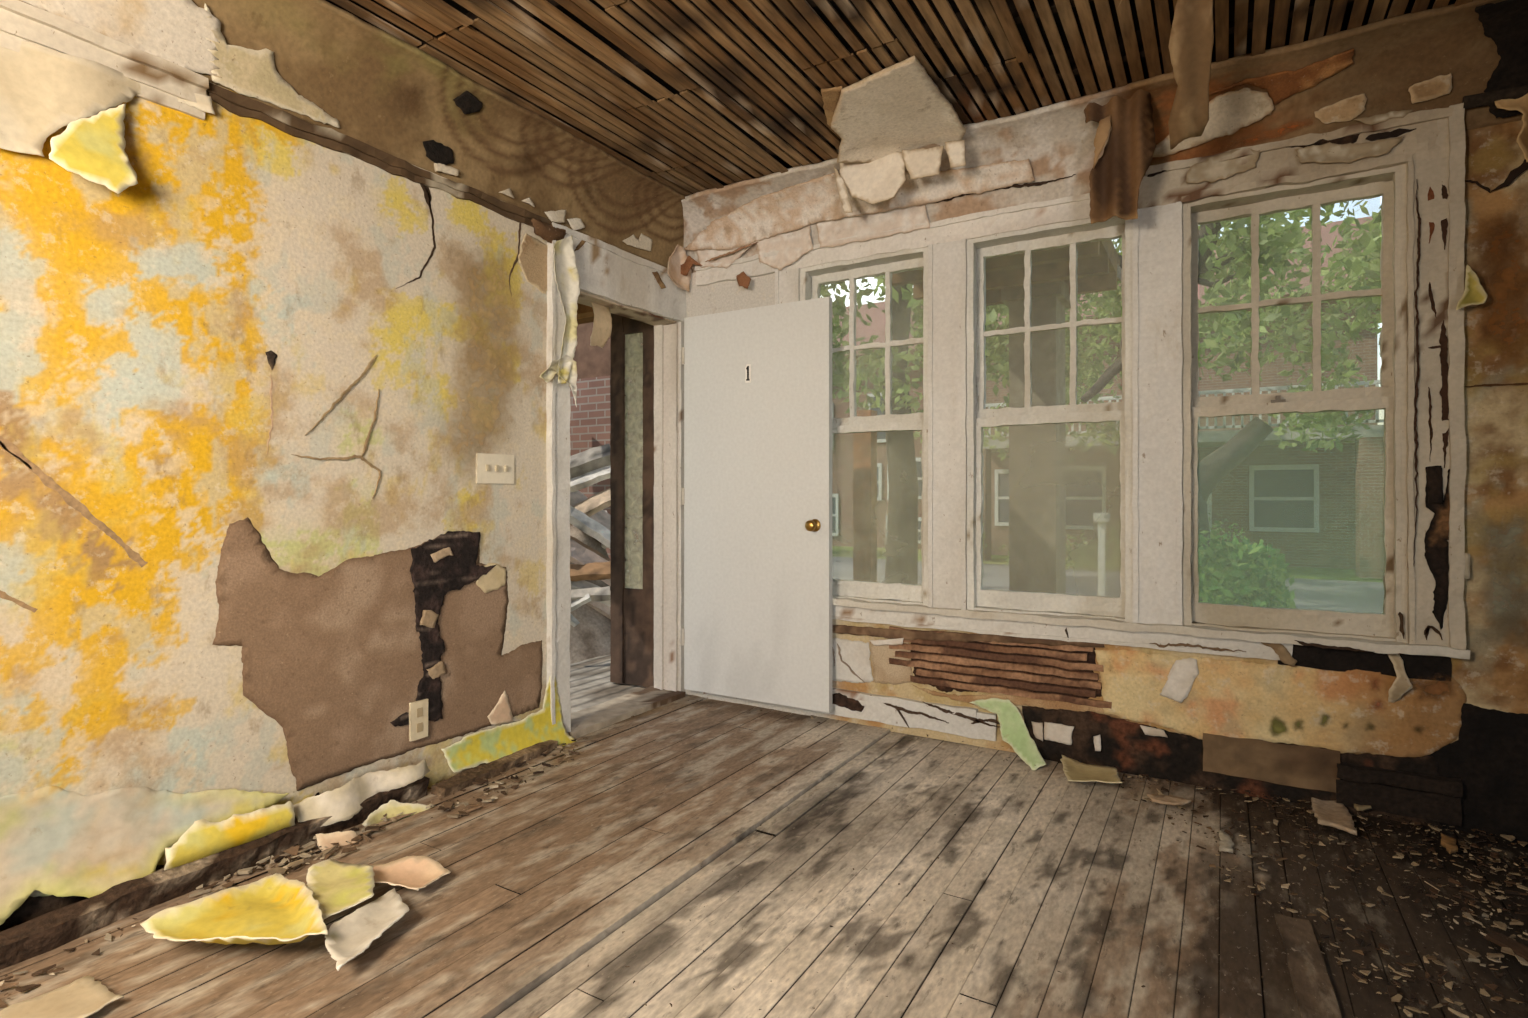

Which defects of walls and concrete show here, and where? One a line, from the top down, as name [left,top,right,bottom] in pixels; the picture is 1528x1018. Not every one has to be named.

peeling [21,0,340,128]
peeling [1153,48,1354,184]
peeling [1294,73,1452,164]
crack [396,184,436,289]
peeling [681,205,930,289]
crack [267,355,381,499]
crack [0,436,148,568]
crack [0,590,38,613]
spalling [212,517,543,791]
peeling [832,638,1168,745]
mould [1271,718,1302,735]
spalling [1423,703,1528,842]